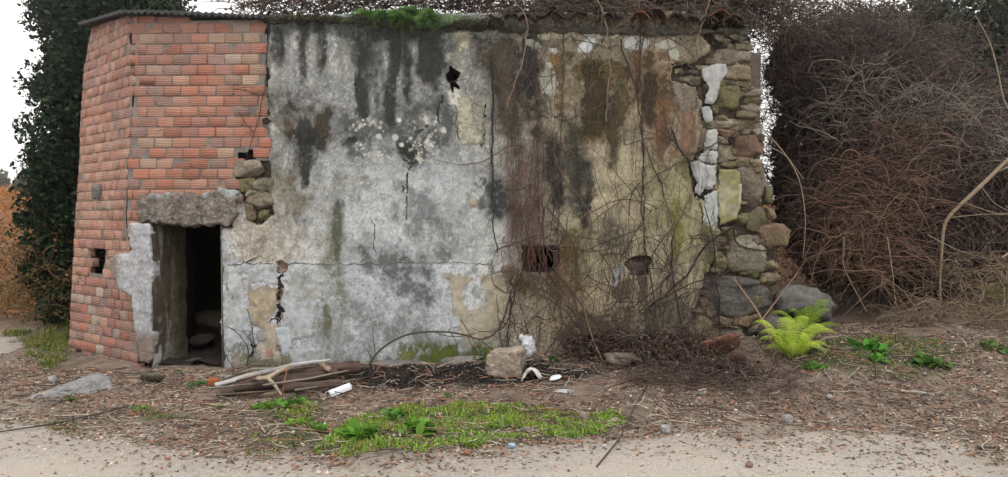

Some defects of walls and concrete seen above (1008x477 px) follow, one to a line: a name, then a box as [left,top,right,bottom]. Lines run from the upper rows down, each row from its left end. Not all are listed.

damp [267,14,634,229]
peeling [223,260,324,368]
crack [231,219,490,357]
peeling [442,266,519,348]